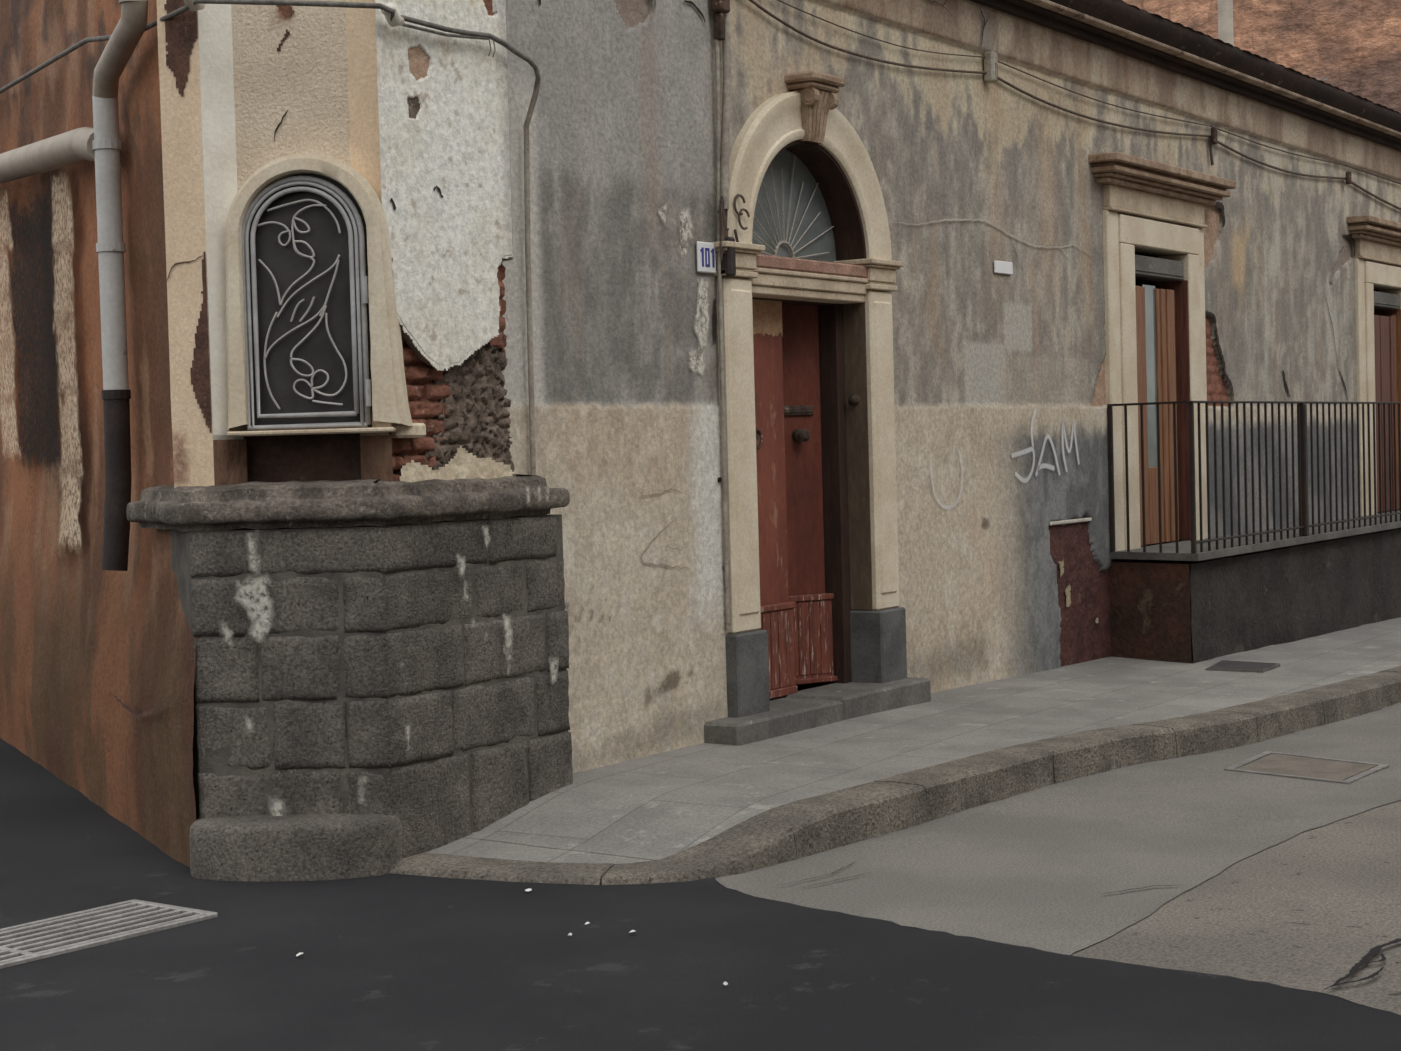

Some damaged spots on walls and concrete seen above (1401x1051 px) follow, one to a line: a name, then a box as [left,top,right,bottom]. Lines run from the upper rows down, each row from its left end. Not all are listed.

spalling [482,0,494,16]
spalling [614,0,656,30]
spalling [407,46,429,119]
spalling [1203,205,1220,270]
spalling [391,255,516,482]
spalling [1205,316,1229,407]
efflorescence [237,540,271,639]